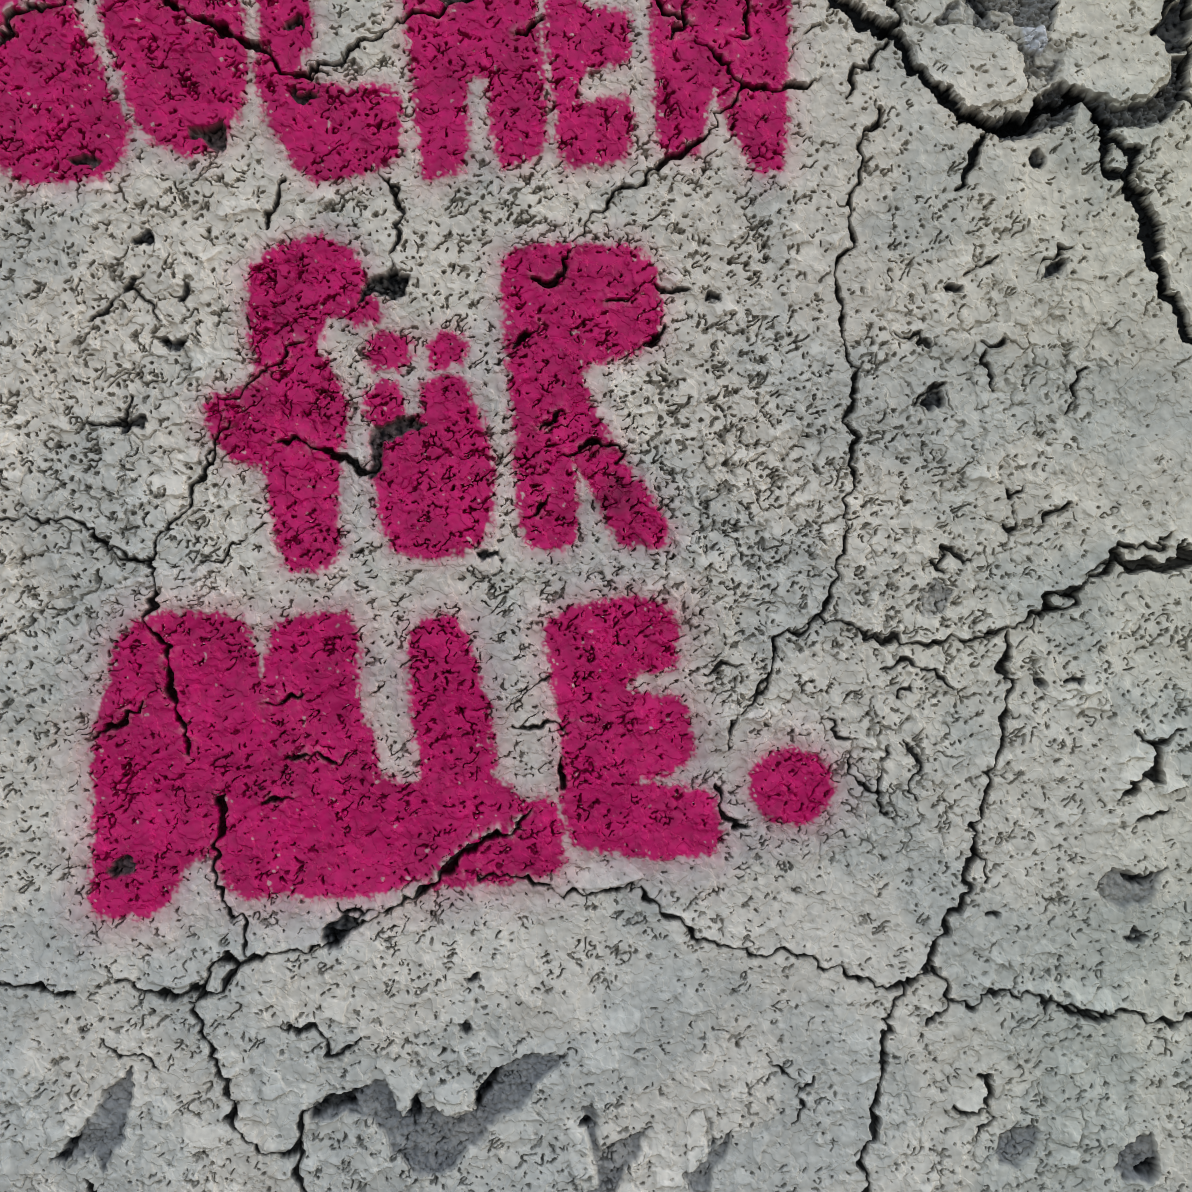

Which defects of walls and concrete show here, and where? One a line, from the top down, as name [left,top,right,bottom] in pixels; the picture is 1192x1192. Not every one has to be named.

crack [0,0,89,48]
crack [162,0,474,82]
flaking render [933,0,1192,169]
crack [264,177,288,231]
crack [374,160,407,275]
crack [531,0,1192,345]
crack [89,273,162,323]
crack [276,435,382,477]
crack [0,341,305,757]
crack [465,106,1192,1192]
crack [0,981,76,1000]
crack [113,793,535,1192]